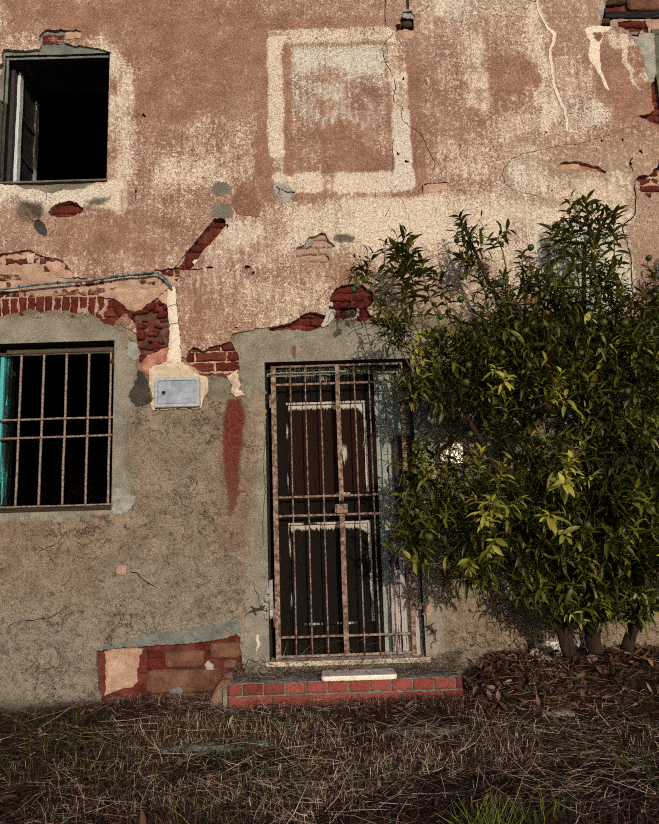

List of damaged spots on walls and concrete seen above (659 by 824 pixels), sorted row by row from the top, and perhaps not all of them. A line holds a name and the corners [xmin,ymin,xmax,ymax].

crack [536,0,579,145]
spalling [585,0,659,91]
spalling [0,31,109,194]
spalling [643,78,659,125]
spalling [51,203,83,218]
spalling [559,163,603,173]
spalling [636,169,659,198]
spalling [296,235,334,265]
spalling [0,220,228,376]
spalling [185,342,245,397]
spalling [98,634,247,703]